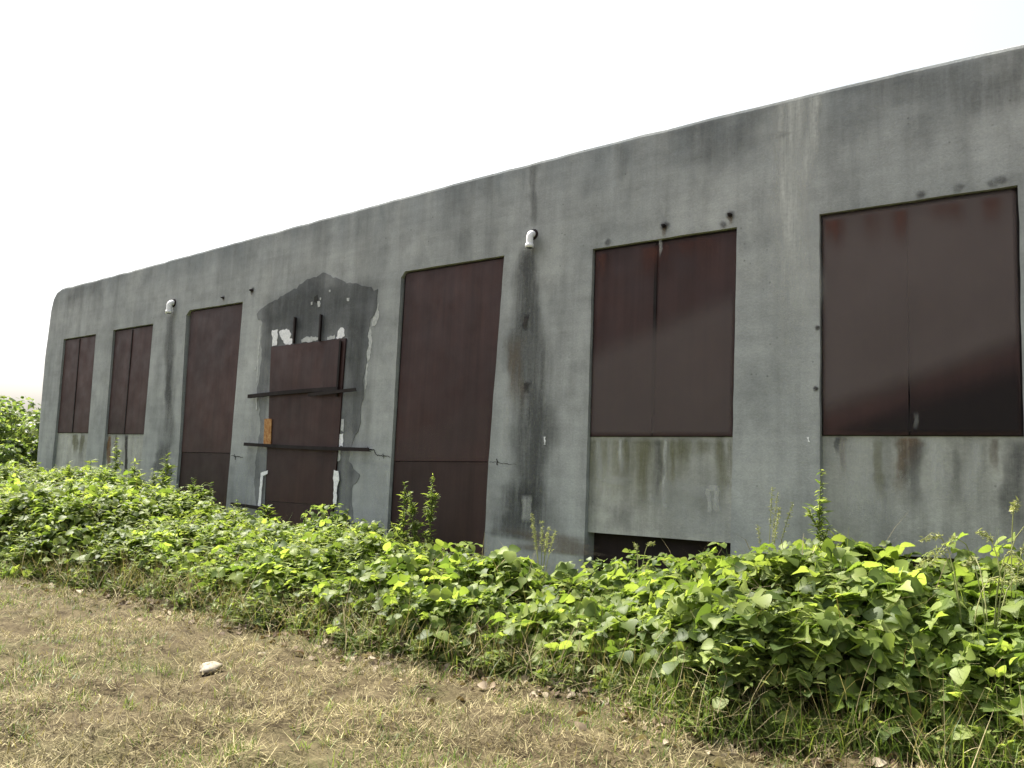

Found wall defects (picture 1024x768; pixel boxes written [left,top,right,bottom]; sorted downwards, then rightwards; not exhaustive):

peeling [256,326,345,383]
spalling [365,302,379,389]
leakage [502,250,549,550]
peeling [258,470,268,517]
peeling [333,419,344,504]